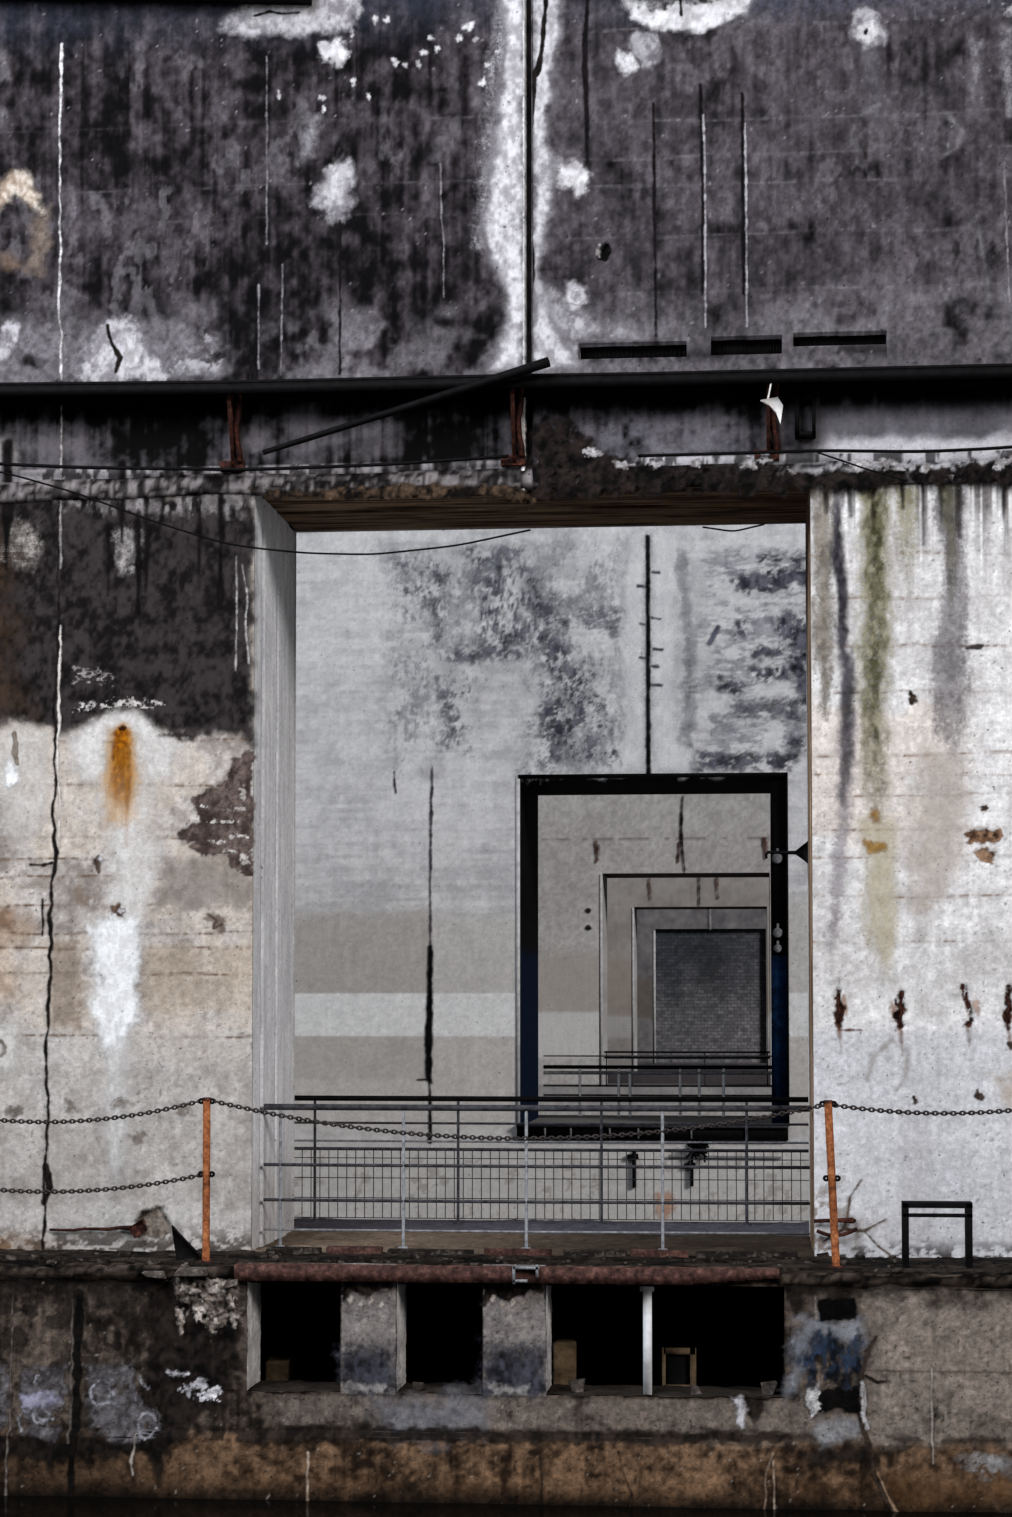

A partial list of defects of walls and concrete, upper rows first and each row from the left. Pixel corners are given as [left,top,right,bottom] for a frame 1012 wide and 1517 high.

water stain [221,0,363,68]
water stain [616,0,751,76]
water stain [313,159,355,223]
water stain [477,0,629,374]
water stain [80,317,222,382]
crack [29,43,64,1250]
peeling [163,726,211,740]
rust [108,725,135,818]
water stain [0,493,257,1168]
peeling [156,750,256,932]
spalling [166,1277,247,1336]
spalling [805,1381,867,1430]